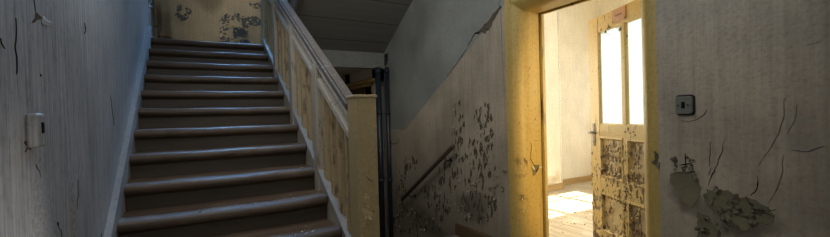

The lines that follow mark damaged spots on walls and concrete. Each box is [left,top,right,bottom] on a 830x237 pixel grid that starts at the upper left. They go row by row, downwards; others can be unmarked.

crack [0,18,18,74]
peeling [218,3,261,44]
peeling [591,141,643,237]
flaking render [669,156,775,237]
crack [746,99,823,218]